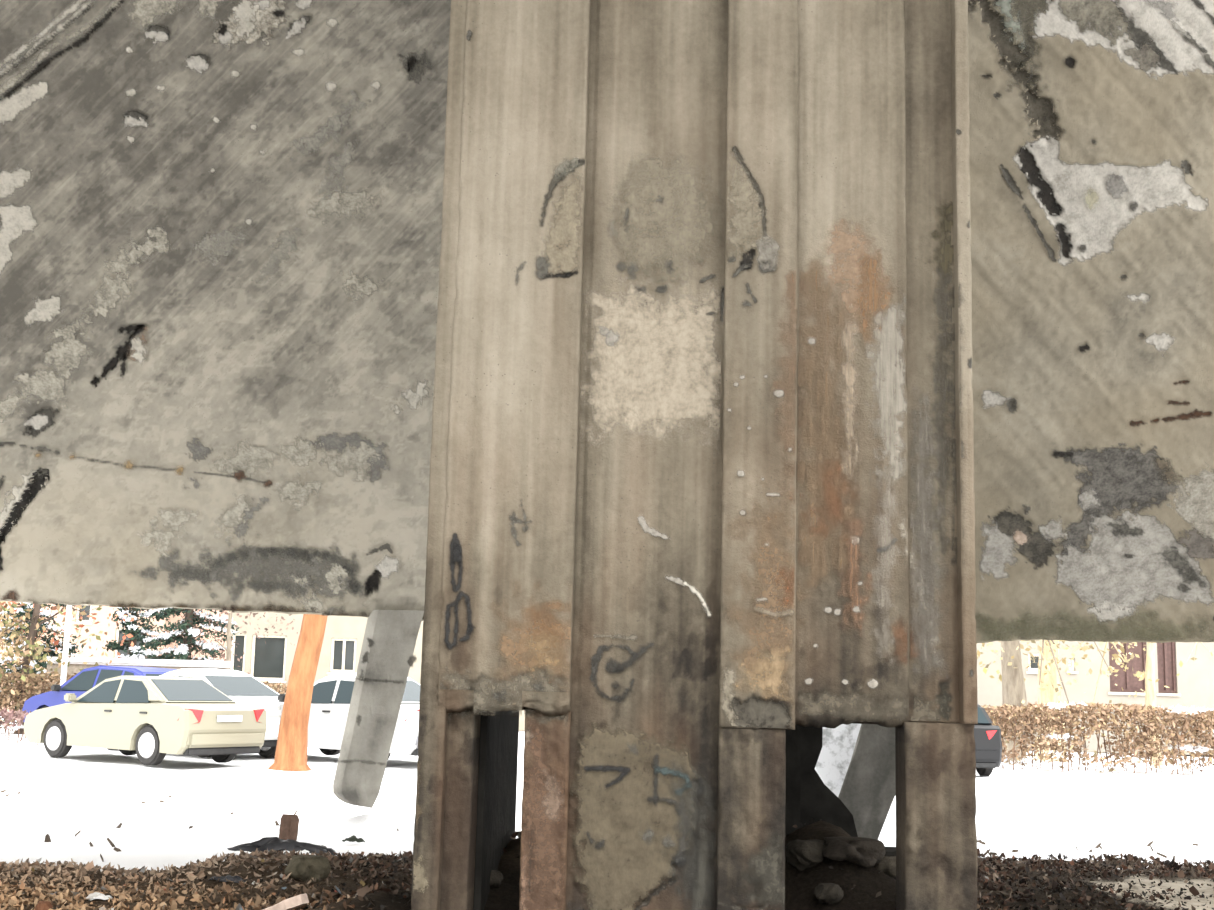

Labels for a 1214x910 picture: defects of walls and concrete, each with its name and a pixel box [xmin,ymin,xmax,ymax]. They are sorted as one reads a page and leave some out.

peeling [1032,0,1214,77]
peeling [0,168,38,275]
spalling [516,158,585,282]
peeling [1000,136,1208,266]
peeling [580,278,721,445]
spalling [0,468,50,570]
crack [0,442,272,487]
leakage [183,548,360,595]
corrosion [732,220,891,701]
peeling [980,470,1214,622]